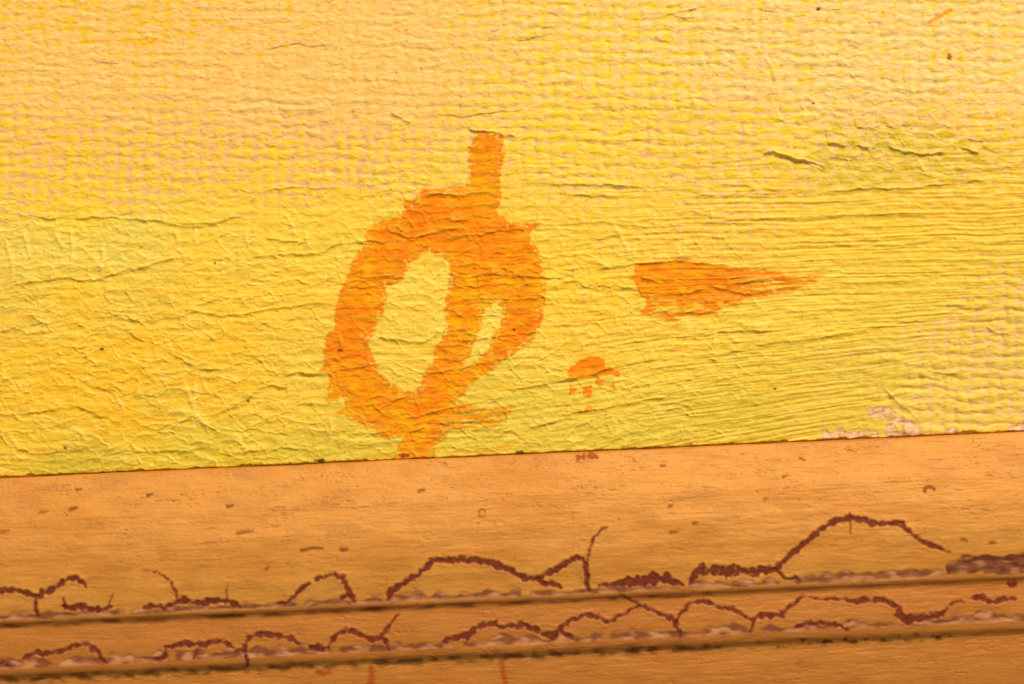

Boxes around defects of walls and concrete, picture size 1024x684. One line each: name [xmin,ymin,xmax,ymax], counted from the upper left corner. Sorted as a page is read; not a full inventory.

peeling [822,406,923,441]
crack [0,575,114,617]
crack [143,512,1017,667]
crack [0,642,107,667]